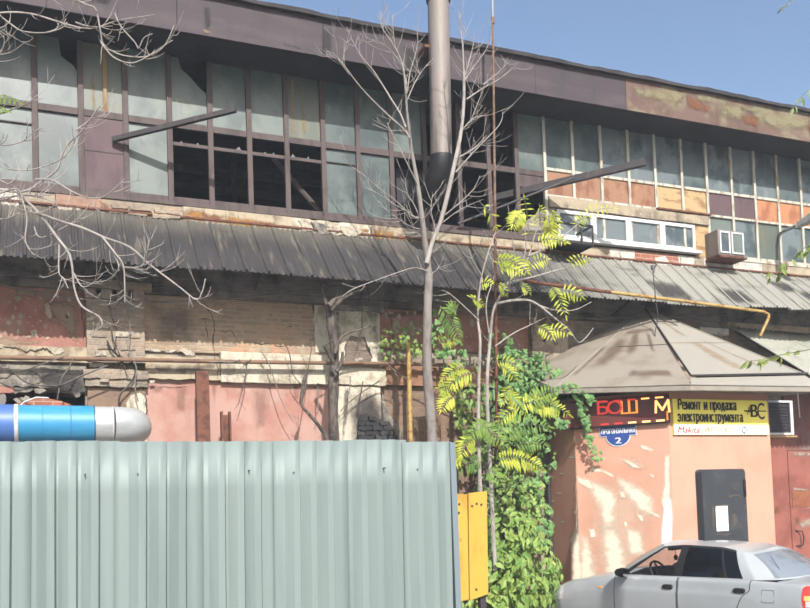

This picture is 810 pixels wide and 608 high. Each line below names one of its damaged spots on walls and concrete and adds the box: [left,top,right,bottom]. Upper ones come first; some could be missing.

peeling [636,89,711,111]
peeling [722,102,810,128]
spalling [298,220,363,237]
crack [0,346,64,355]
peeling [0,290,140,367]
spalling [145,348,195,356]
crack [202,304,237,376]
spalling [336,313,373,361]
spalling [0,365,87,406]
spalling [149,366,200,383]
peeling [126,393,148,414]
peeling [570,455,672,580]